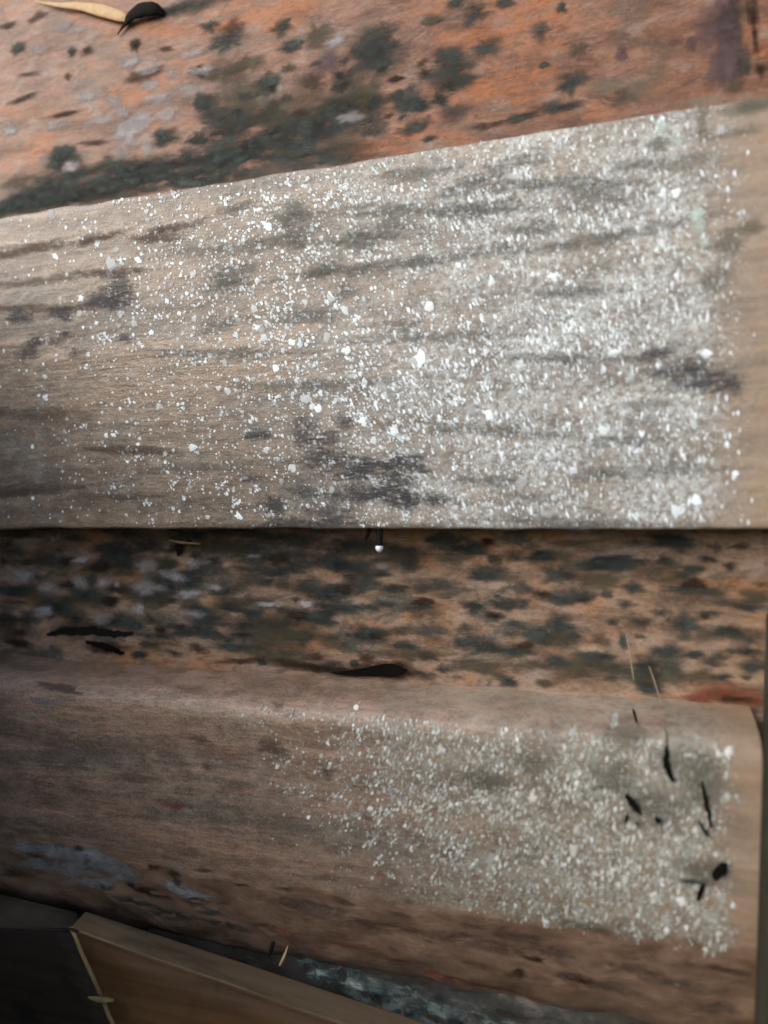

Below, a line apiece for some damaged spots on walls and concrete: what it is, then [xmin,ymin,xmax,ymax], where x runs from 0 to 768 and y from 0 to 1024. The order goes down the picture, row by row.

mould [0,17,476,216]
mould [475,71,586,128]
water stain [0,240,62,258]
water stain [79,231,119,246]
water stain [136,223,192,243]
water stain [0,268,140,334]
water stain [642,347,744,391]
water stain [0,416,765,693]
crack [663,729,674,782]
crack [625,794,662,825]
crack [698,781,712,836]
crack [679,862,728,901]